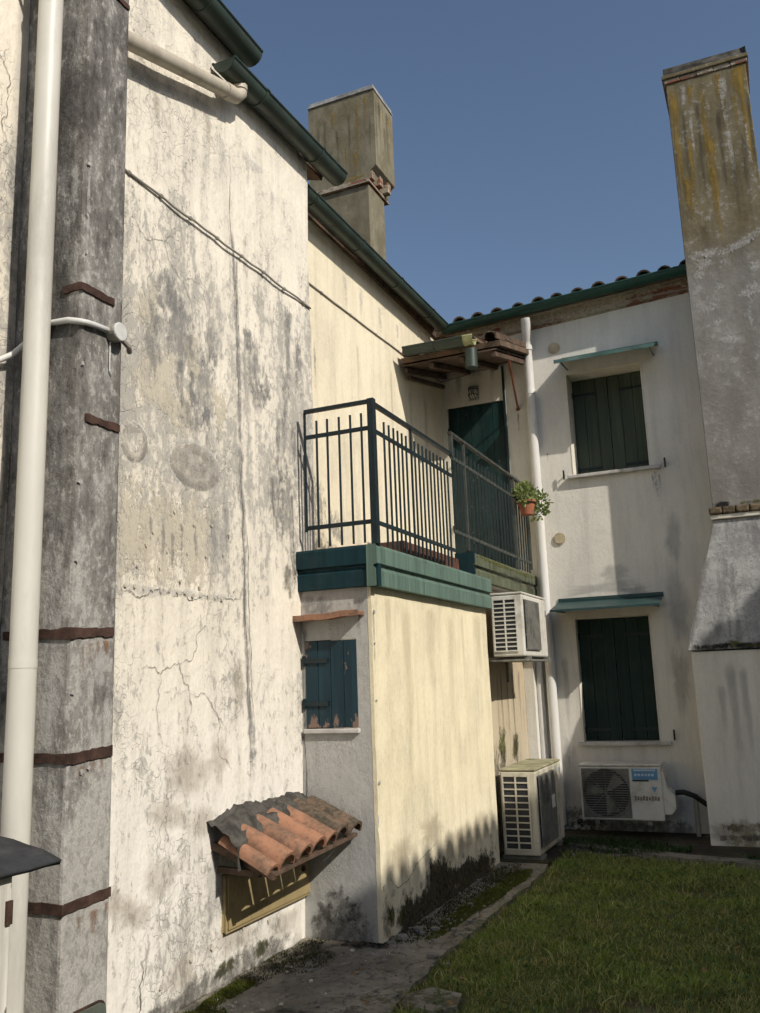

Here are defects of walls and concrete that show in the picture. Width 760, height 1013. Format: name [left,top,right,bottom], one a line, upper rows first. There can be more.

crack [0,49,11,151]
crack [138,157,255,771]
leakage [299,890,391,955]